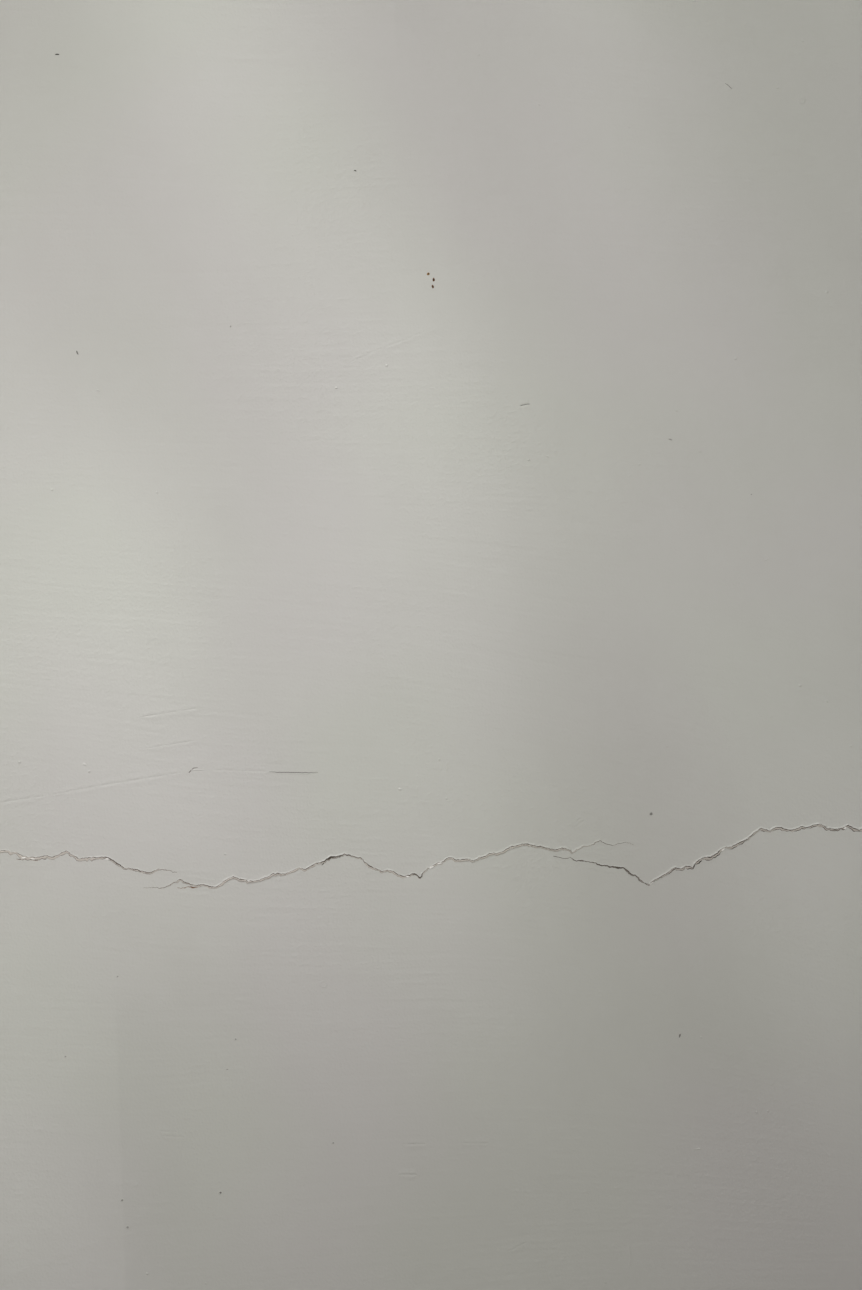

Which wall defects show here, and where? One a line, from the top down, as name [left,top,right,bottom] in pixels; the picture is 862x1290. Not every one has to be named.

crack [0,822,862,889]